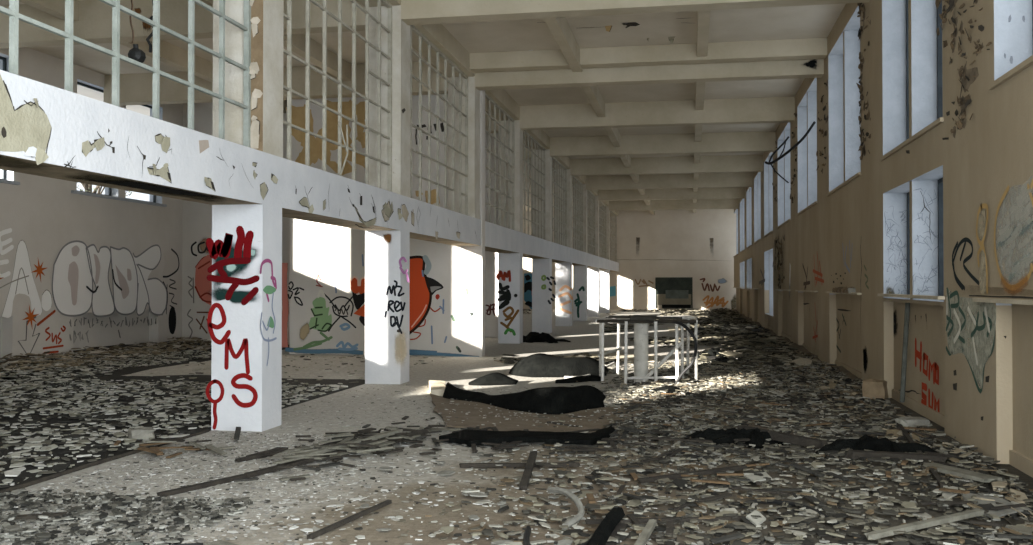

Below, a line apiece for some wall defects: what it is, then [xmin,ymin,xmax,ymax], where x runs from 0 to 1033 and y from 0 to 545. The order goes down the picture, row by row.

peeling [857,3,871,160]
peeling [935,0,992,140]
peeling [0,75,52,165]
peeling [82,129,115,157]
peeling [143,133,172,183]
peeling [286,99,365,175]
peeling [295,189,326,213]
peeling [347,188,415,227]
peeling [415,189,440,204]